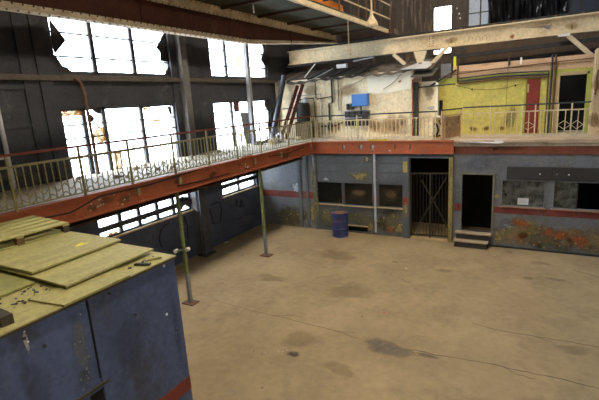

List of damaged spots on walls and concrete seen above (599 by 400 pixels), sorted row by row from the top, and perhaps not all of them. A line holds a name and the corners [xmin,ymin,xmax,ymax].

crack [217,300,599,389]